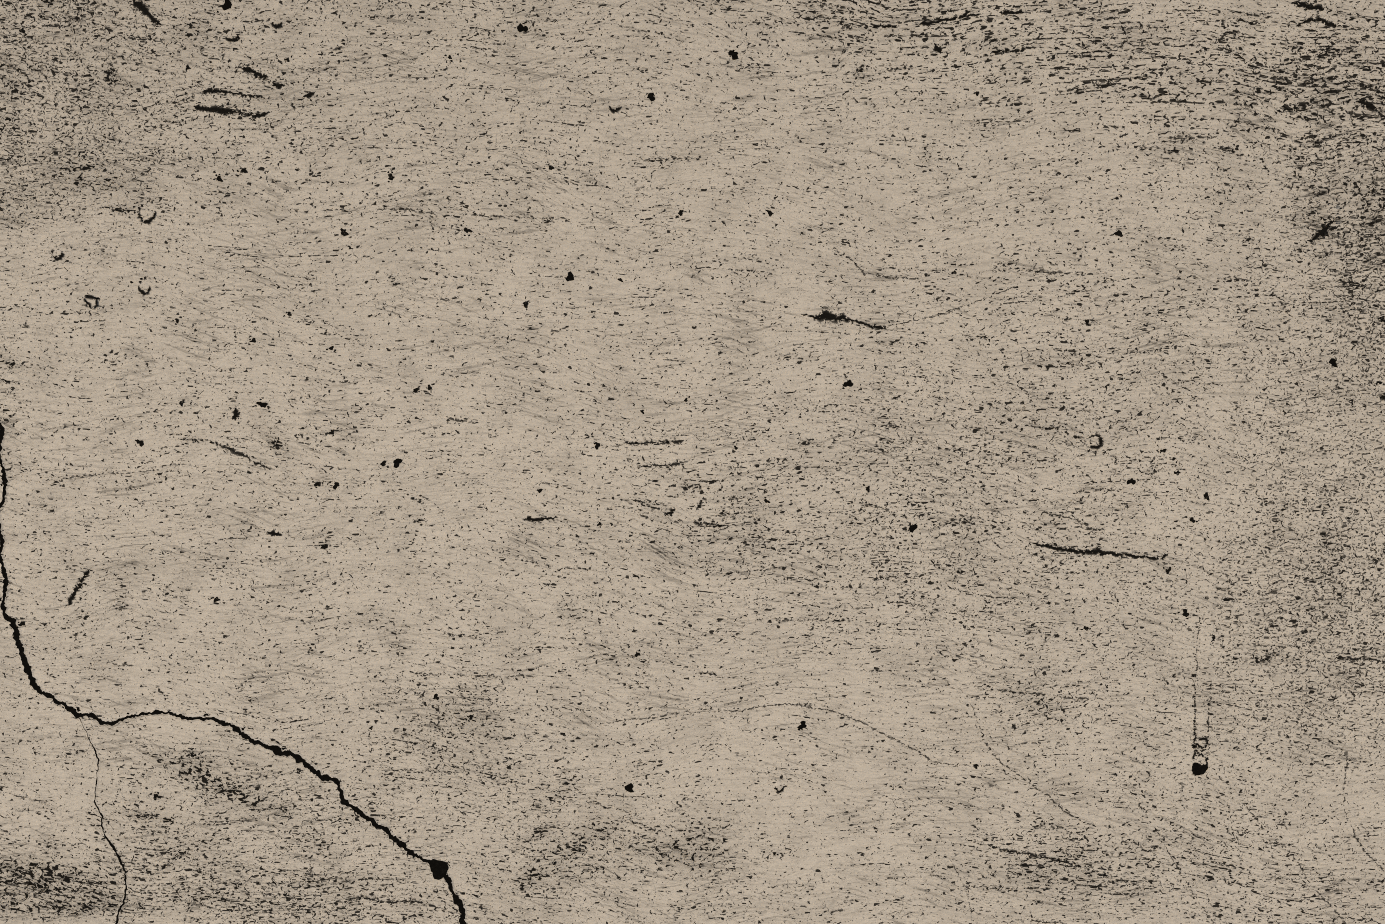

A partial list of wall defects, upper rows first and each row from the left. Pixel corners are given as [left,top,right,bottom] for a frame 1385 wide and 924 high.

crack [0,378,468,924]